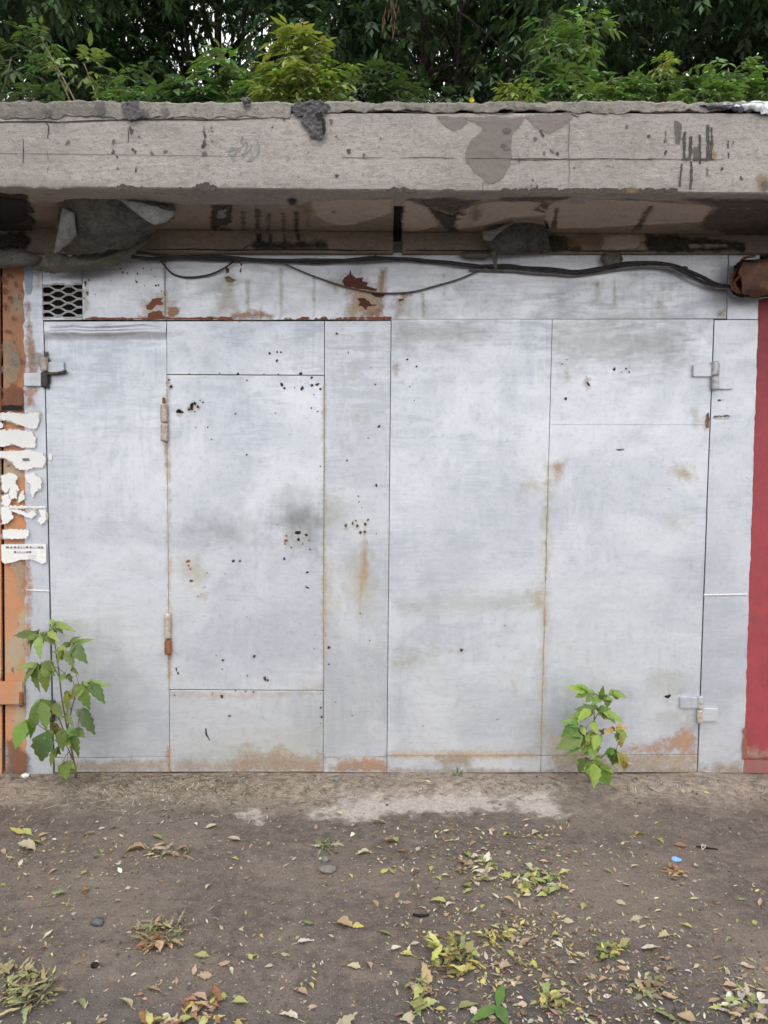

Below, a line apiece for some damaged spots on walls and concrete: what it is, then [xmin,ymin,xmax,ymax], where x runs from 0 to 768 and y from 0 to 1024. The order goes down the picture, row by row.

damp [633,121,768,253]
corrosion [85,298,270,320]
corrosion [285,270,392,320]
corrosion [333,759,386,771]